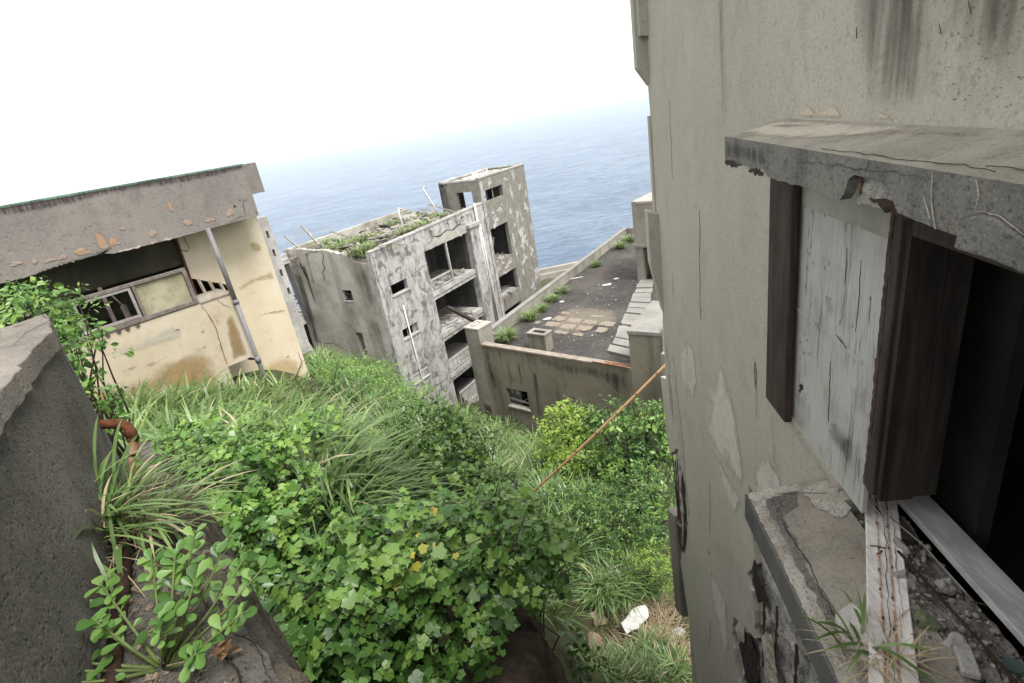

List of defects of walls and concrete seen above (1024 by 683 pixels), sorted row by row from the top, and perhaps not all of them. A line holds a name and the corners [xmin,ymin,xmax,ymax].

spalling [11,227,126,275]
peeling [488,177,540,291]
spalling [856,178,910,220]
crack [799,148,1024,235]
damp [229,319,245,355]
spalling [735,553,821,683]
spalling [748,480,858,683]
rust [875,498,901,683]